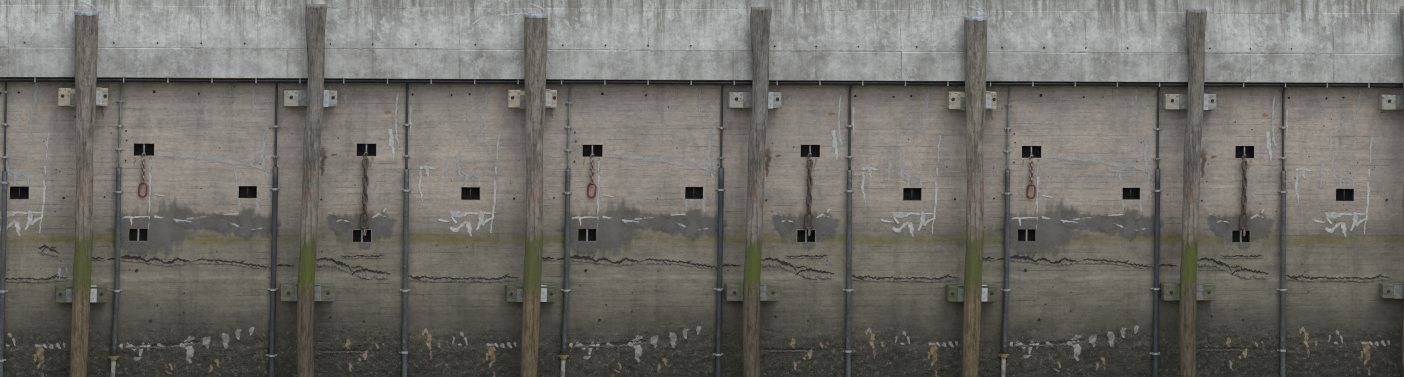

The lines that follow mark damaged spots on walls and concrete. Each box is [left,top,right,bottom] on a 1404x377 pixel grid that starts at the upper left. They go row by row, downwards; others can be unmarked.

crack [5,243,1392,284]